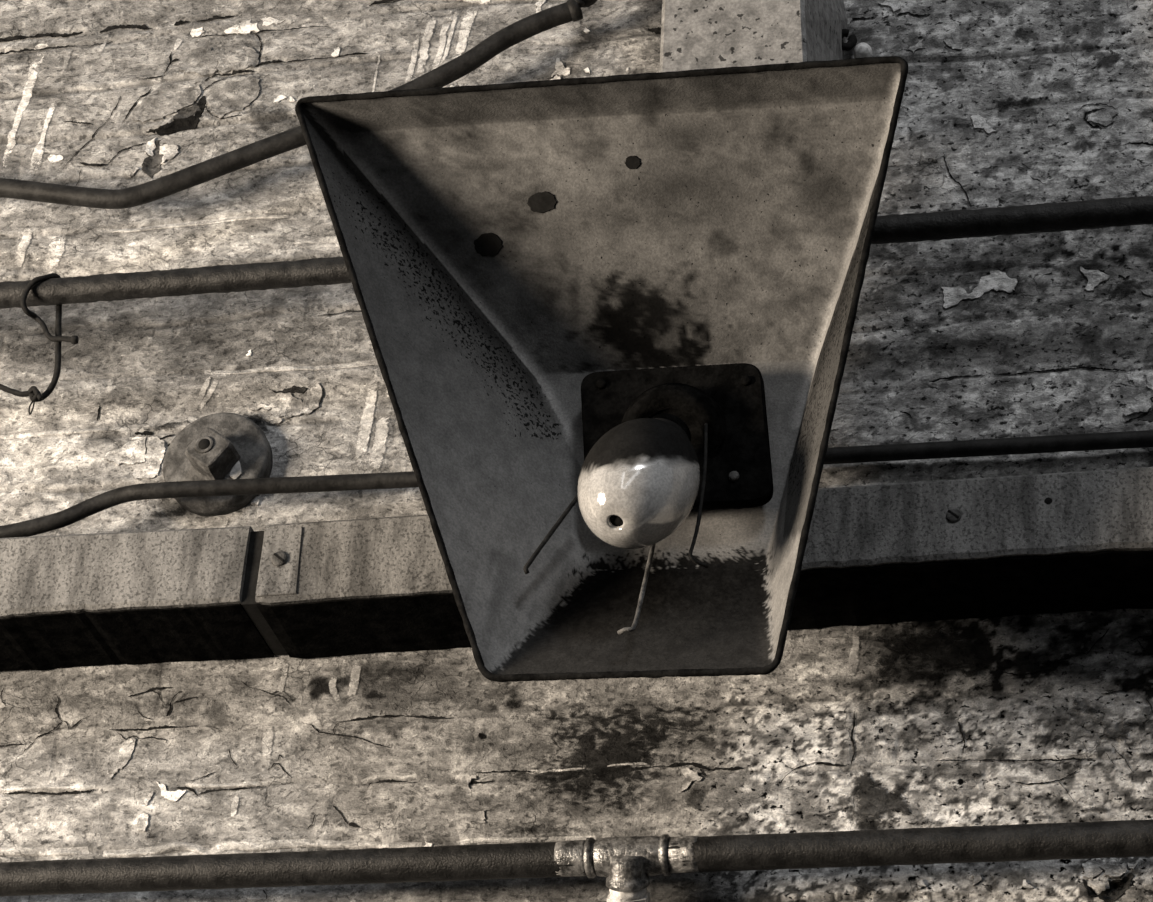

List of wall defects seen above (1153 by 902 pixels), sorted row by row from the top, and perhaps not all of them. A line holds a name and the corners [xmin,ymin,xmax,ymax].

crack [63,26,367,186]
spalling [125,96,206,178]
peeling [941,270,1018,309]
peeling [1080,267,1110,292]
water stain [846,631,859,679]
water stain [874,627,986,678]
crack [0,687,197,752]
crack [241,681,391,748]
crack [177,749,292,796]
water stain [507,699,717,812]
crack [308,805,360,828]
water stain [496,822,596,838]